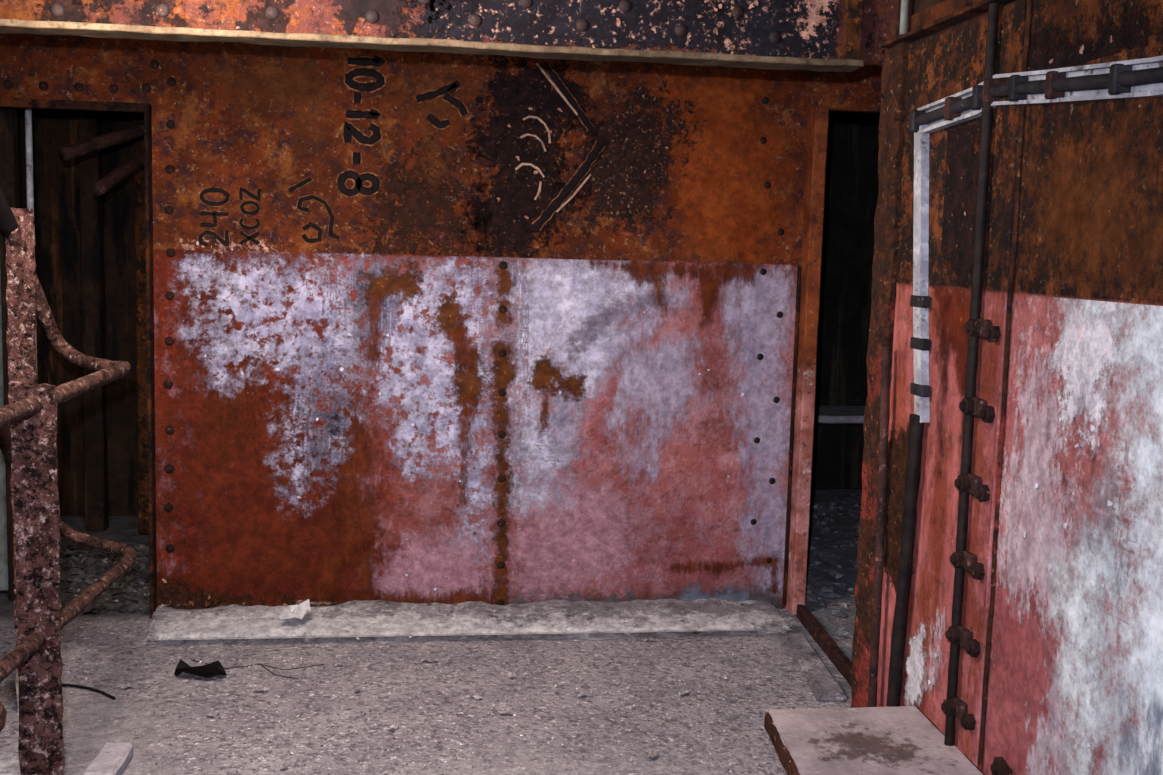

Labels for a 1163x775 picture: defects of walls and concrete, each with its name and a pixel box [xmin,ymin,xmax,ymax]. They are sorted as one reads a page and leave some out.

rust [1,0,188,28]
rust [245,0,298,33]
rust [590,67,785,322]
rust [156,257,587,610]
peeling [173,241,672,562]
rust [883,423,918,595]
rust [933,286,971,475]
rust [978,399,997,540]
peeling [997,298,1163,775]